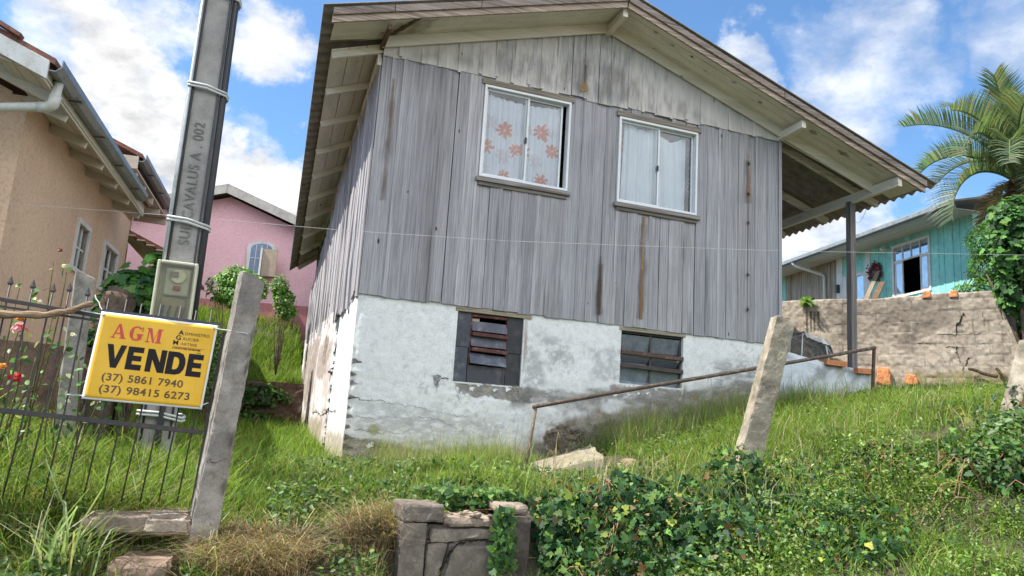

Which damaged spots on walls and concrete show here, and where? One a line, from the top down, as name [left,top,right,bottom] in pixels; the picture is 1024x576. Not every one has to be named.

crack [835,311,1003,371]
crack [312,326,468,447]
spalling [455,383,530,404]